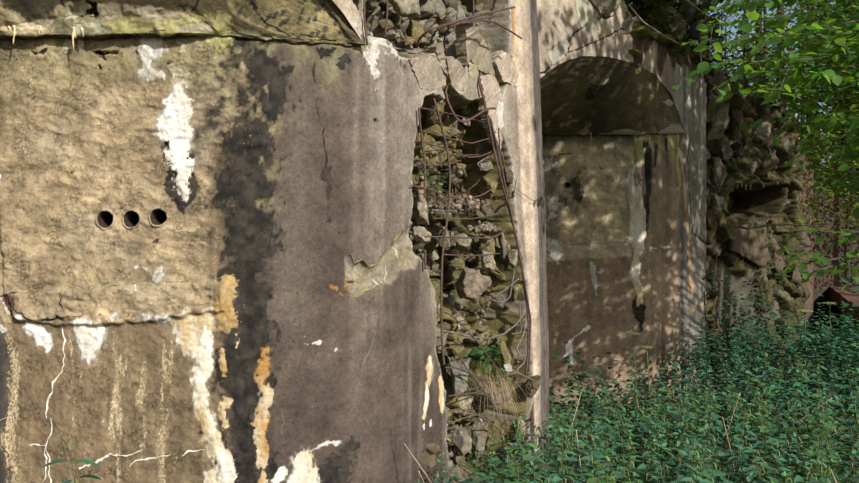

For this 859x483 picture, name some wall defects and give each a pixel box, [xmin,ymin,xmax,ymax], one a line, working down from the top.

crack [247,0,291,37]
crack [540,0,622,79]
damp [0,1,360,483]
damp [544,103,685,331]
crack [4,253,219,483]
corrosion [250,347,274,483]